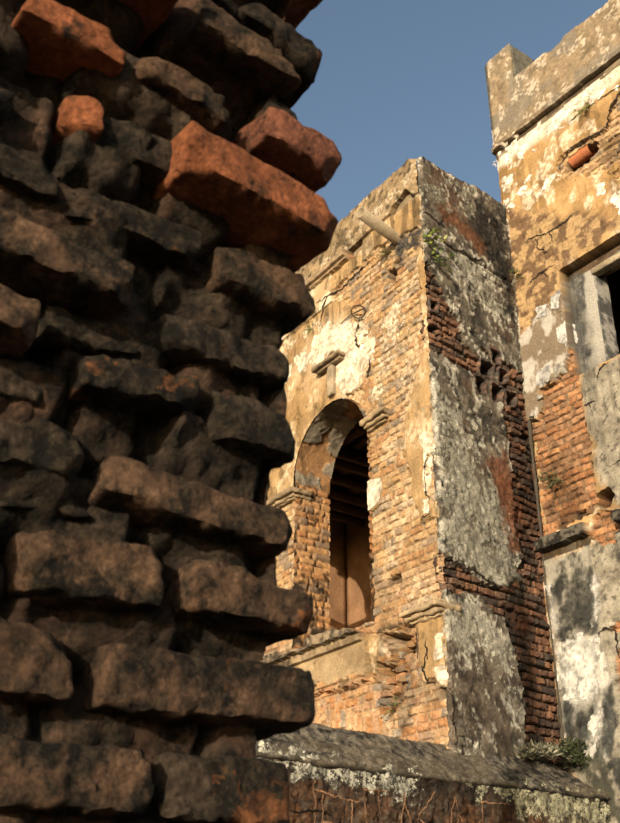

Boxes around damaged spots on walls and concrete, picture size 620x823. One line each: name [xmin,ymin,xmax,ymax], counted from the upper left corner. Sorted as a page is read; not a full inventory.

peeling [493,69,620,215]
water stain [469,198,516,319]
spalling [276,500,296,589]
spalling [280,228,620,770]
water stain [544,558,606,640]
crack [422,640,457,733]
water stain [562,701,593,745]
water stain [600,685,620,789]